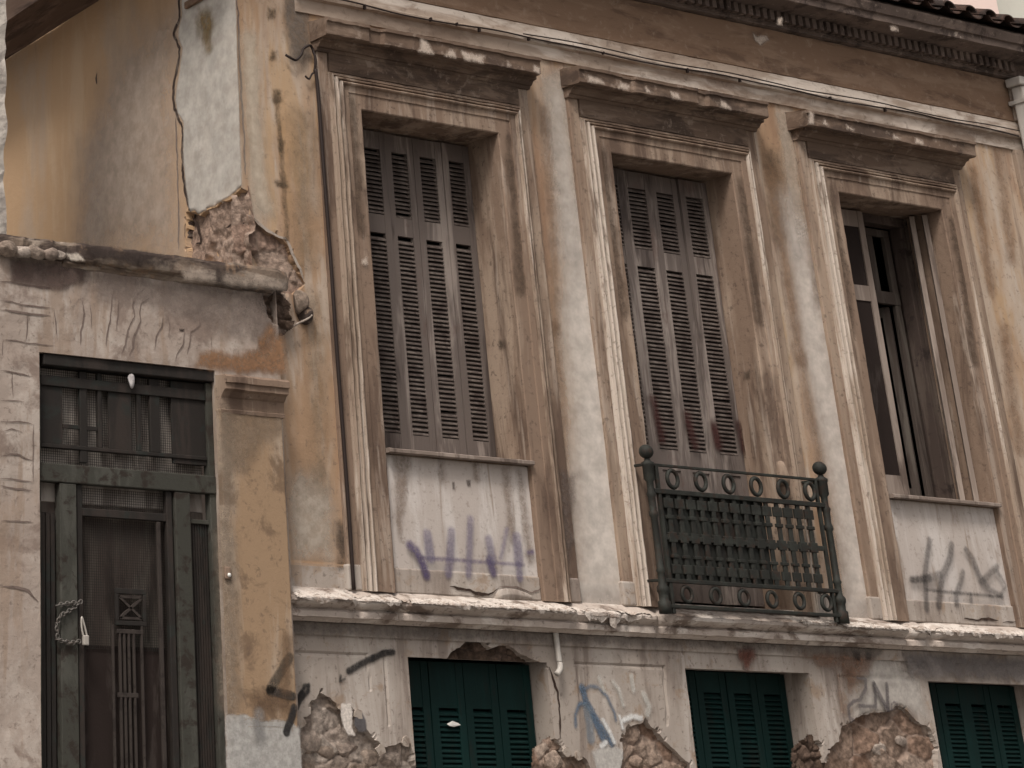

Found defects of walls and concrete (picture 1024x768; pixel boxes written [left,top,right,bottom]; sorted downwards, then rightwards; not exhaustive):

crack [172,0,202,250]
spalling [184,187,313,336]
crack [0,281,212,491]
damp [218,412,280,709]
spalling [443,642,525,662]
spalling [299,695,416,768]
spalling [531,736,586,768]
spalling [620,723,687,768]
spalling [791,707,934,768]